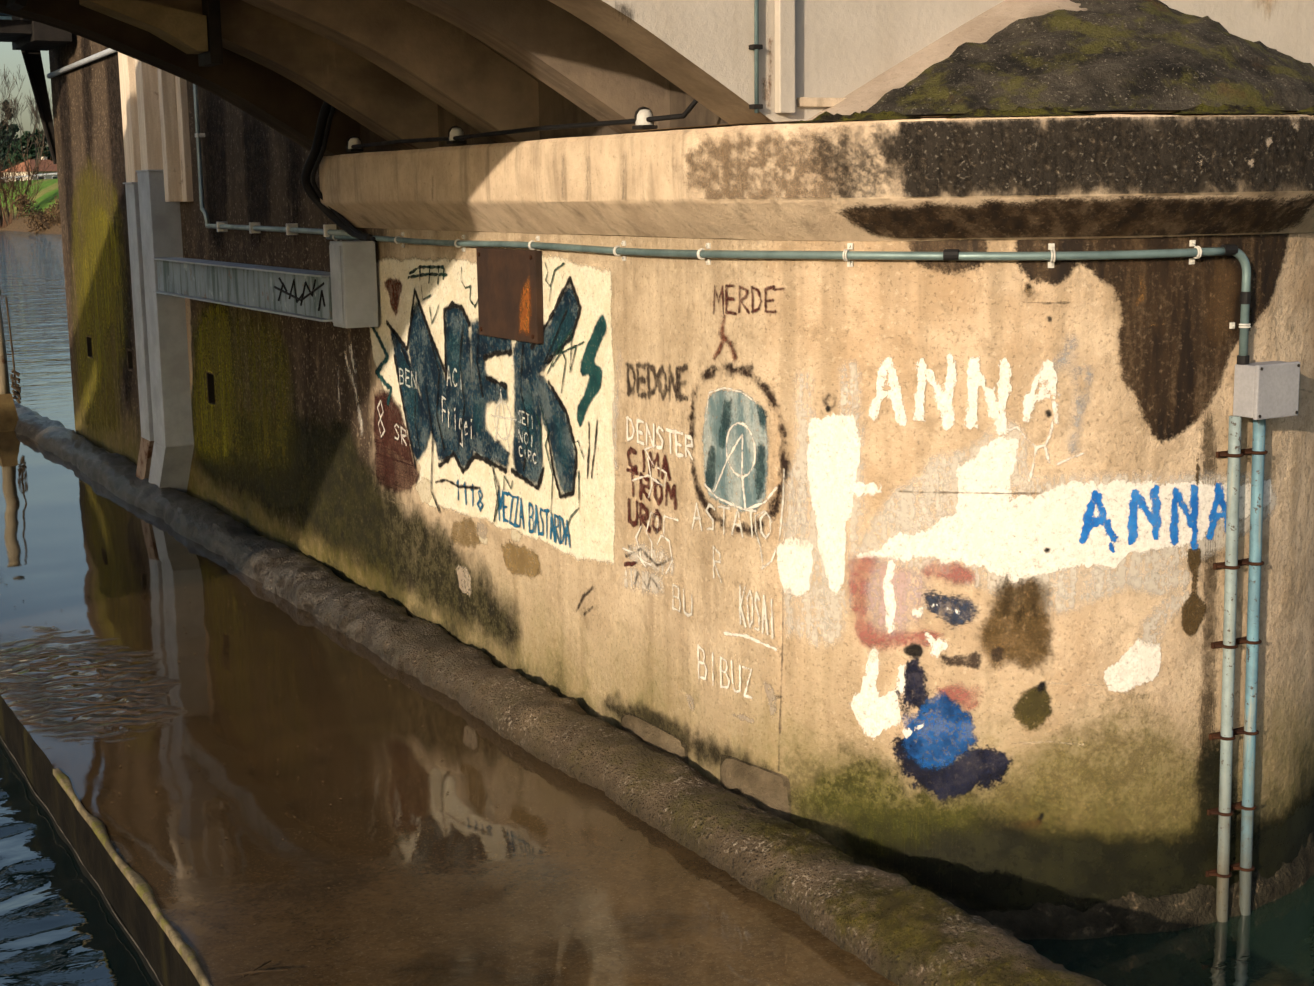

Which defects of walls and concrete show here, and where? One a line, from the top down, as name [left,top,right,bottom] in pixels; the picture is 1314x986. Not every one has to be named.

damp [58,38,132,434]
damp [192,302,295,470]
damp [686,128,1314,485]
damp [845,540,1314,912]